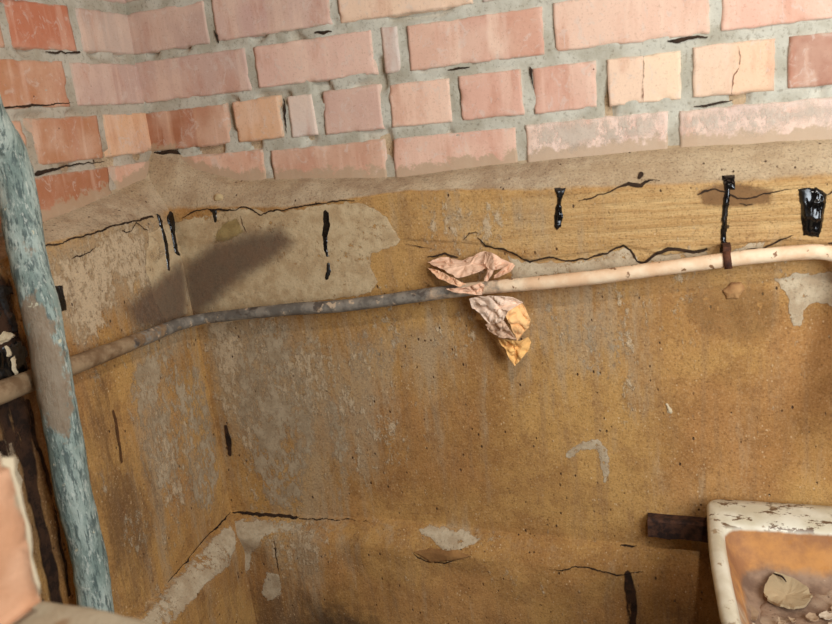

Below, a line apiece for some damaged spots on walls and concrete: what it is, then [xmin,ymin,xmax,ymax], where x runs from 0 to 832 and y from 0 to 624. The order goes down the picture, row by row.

crack [579,172,660,201]
crack [698,188,789,206]
crack [45,215,153,259]
peeling [145,201,401,315]
crack [404,232,708,264]
crack [746,235,793,250]
peeling [774,272,832,326]
water stain [624,571,637,624]